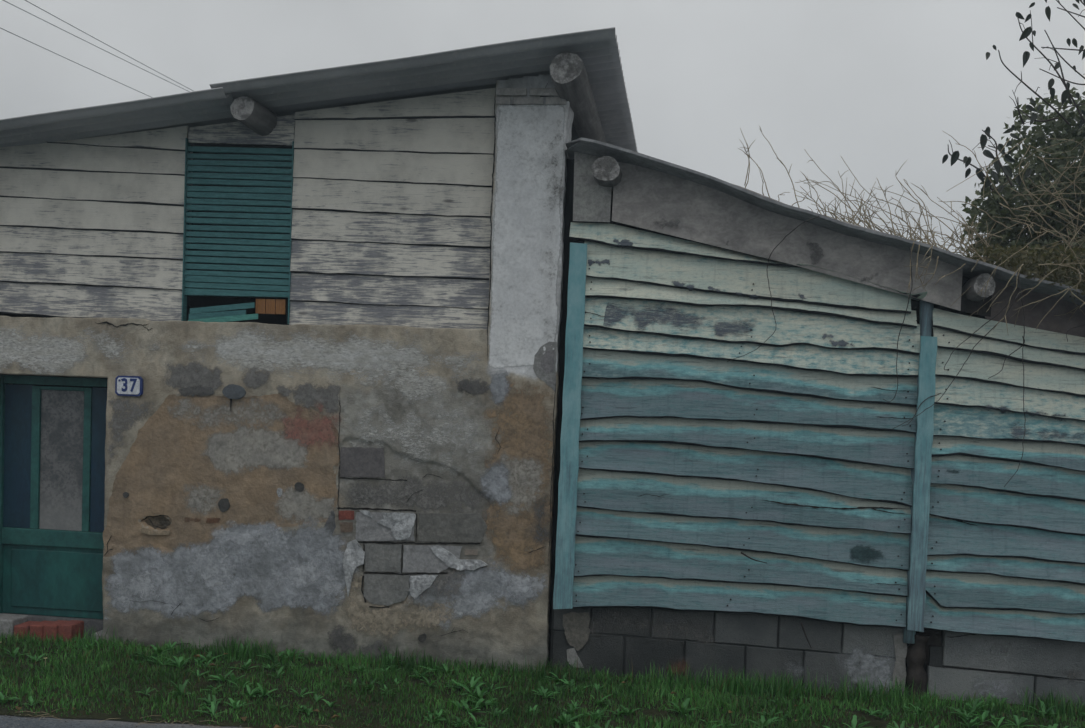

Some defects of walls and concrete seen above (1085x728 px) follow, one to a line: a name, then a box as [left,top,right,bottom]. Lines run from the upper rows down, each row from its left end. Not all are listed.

peeling [602,301,754,337]
peeling [430,341,557,571]
peeling [103,393,416,597]
peeling [409,575,438,599]
spalling [562,612,590,668]